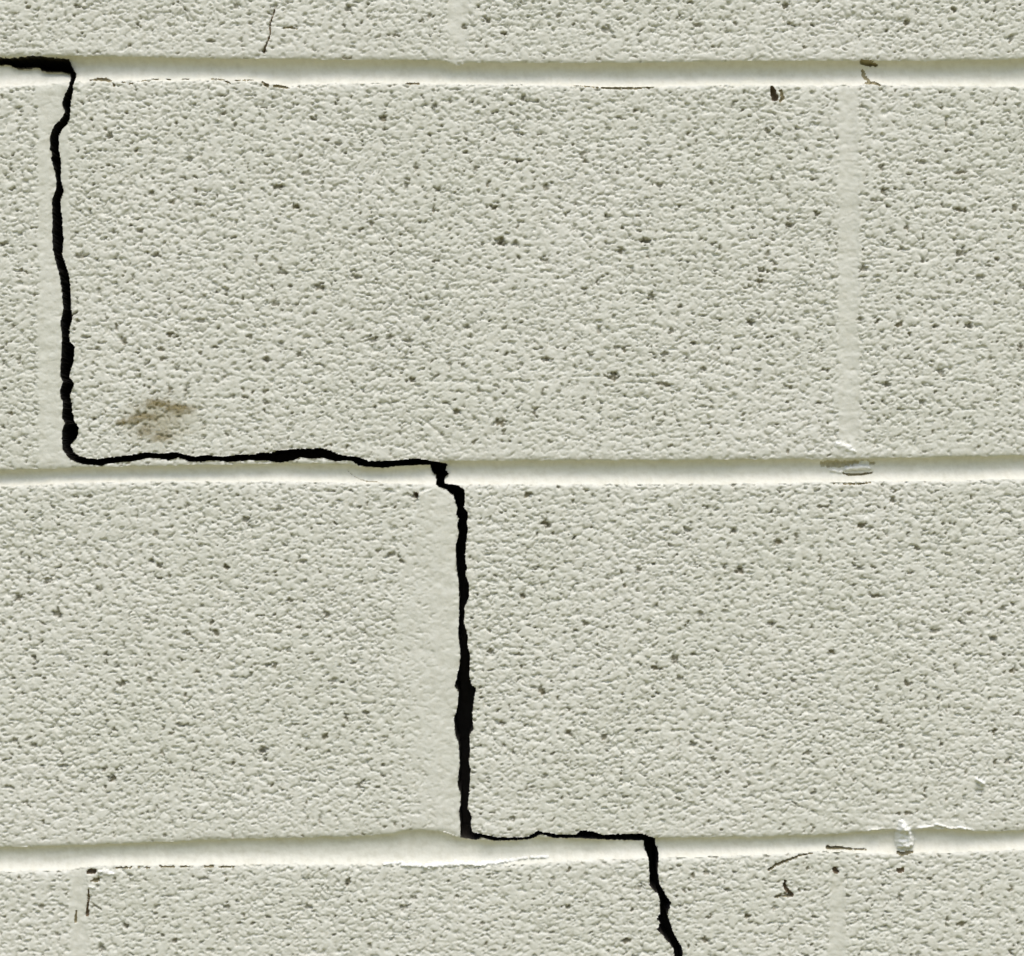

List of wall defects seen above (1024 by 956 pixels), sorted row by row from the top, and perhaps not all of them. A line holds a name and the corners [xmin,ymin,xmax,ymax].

crack [0,55,683,956]